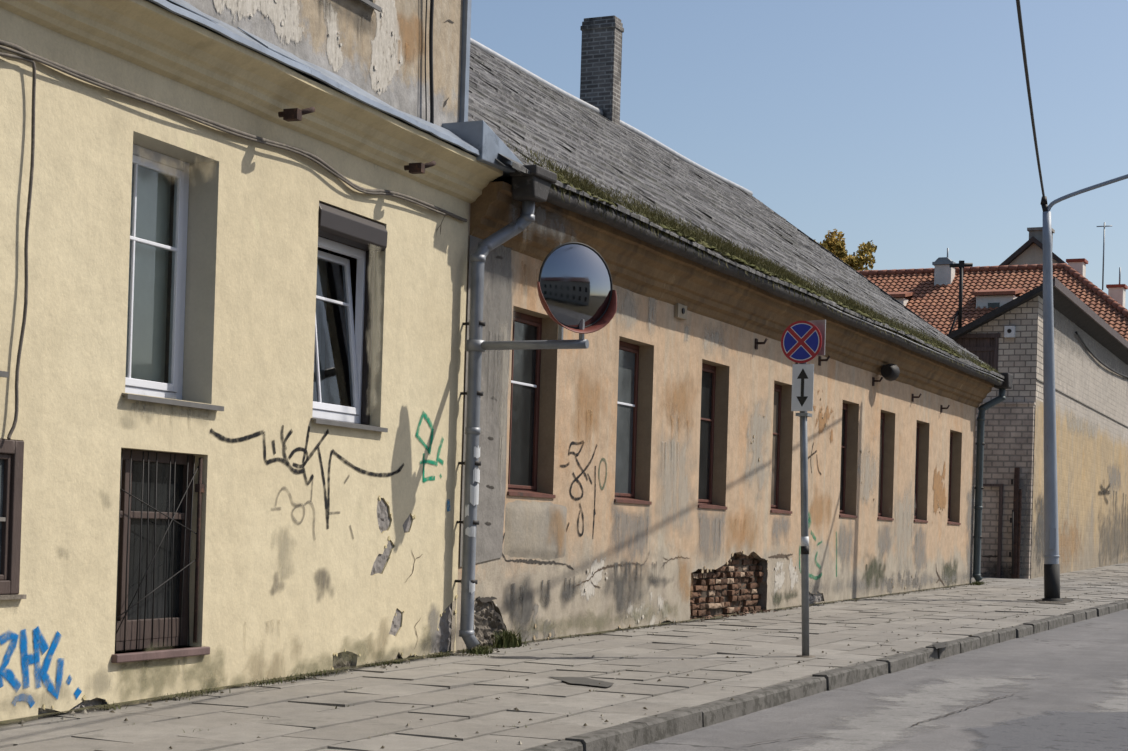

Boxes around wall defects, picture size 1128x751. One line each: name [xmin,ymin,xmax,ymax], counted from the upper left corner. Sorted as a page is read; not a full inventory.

peeling [214,0,304,45]
peeling [323,0,344,72]
peeling [370,0,403,97]
spalling [371,496,416,576]
spalling [389,608,405,636]
spalling [392,595,458,662]
spalling [473,598,555,648]
water stain [504,576,576,626]
flaking render [615,550,798,631]